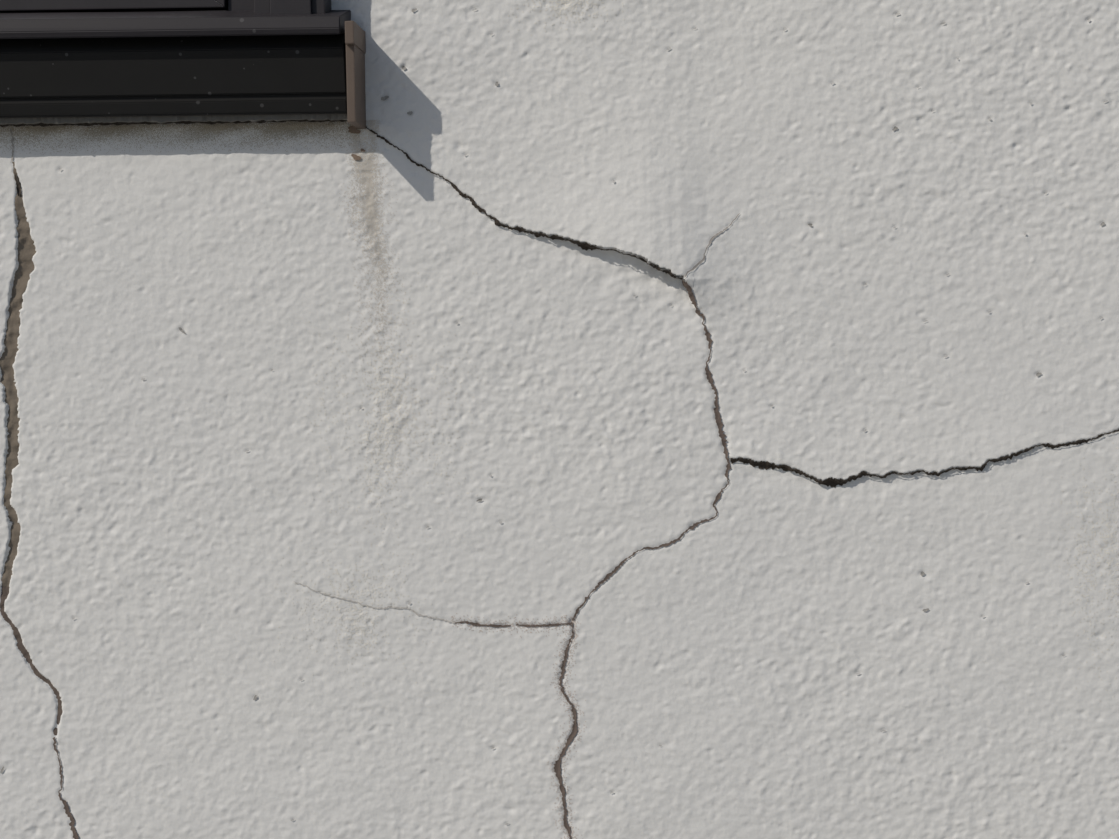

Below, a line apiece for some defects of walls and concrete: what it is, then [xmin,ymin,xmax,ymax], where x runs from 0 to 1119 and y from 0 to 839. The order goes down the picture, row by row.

crack [0,129,79,839]
crack [294,126,1119,839]